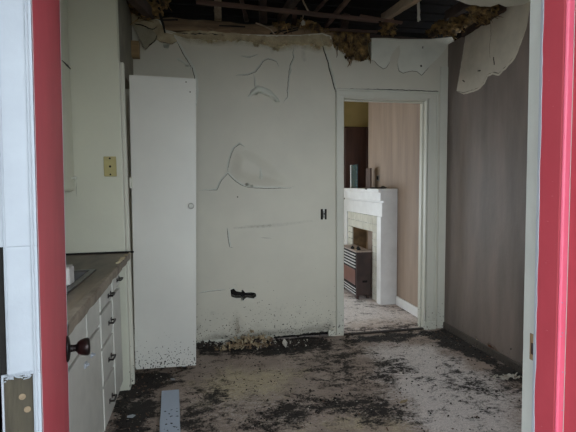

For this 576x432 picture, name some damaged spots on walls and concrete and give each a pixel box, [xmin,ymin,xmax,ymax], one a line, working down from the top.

crack [238,47,295,101]
peeling [131,13,449,76]
crack [321,39,353,92]
crack [200,142,294,191]
hole [230,287,257,302]